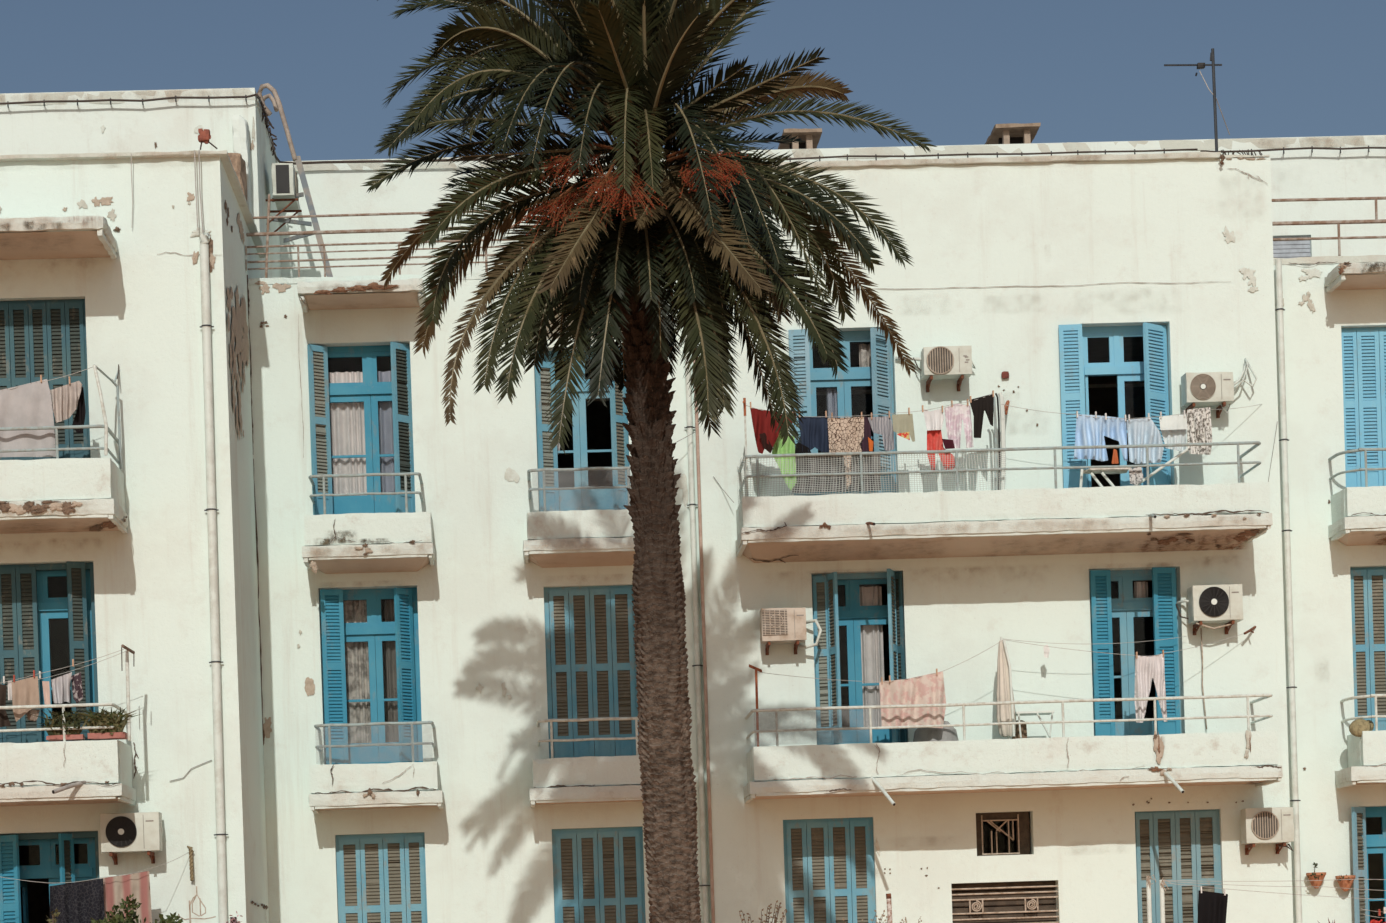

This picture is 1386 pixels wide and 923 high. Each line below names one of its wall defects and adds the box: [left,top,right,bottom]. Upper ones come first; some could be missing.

peeling [62,197,120,232]
spalling [190,227,216,272]
peeling [1239,267,1258,293]
peeling [225,200,291,440]
spalling [0,500,82,515]
spalling [89,516,127,531]